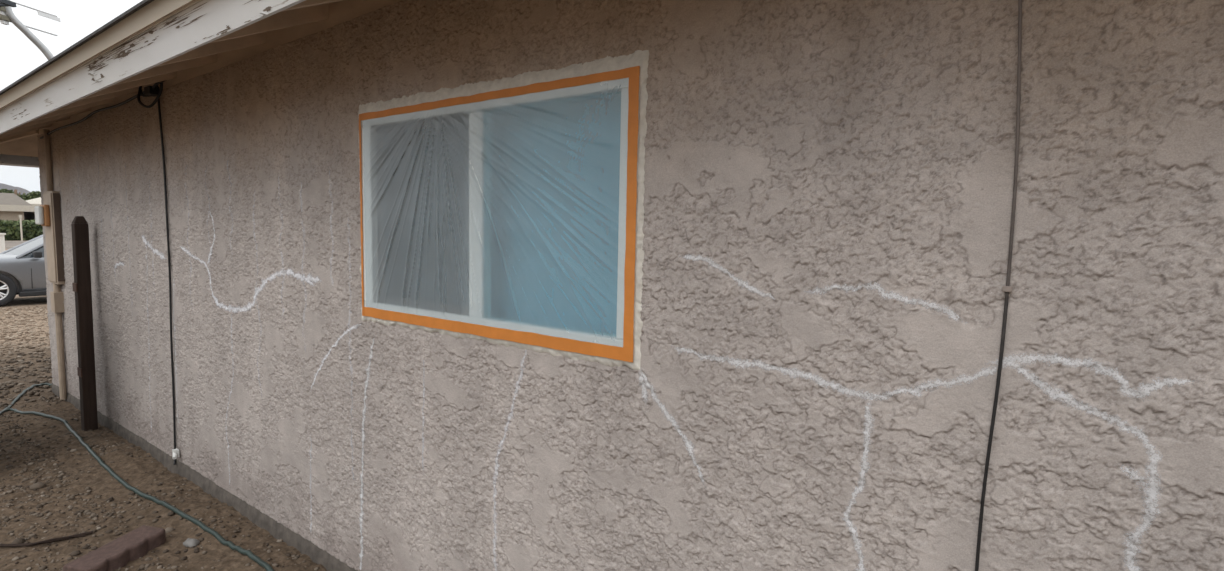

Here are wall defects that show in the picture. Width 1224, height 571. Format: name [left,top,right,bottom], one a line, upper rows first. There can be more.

peeling [86,2,207,83]
crack [115,212,322,483]
crack [311,324,374,570]
crack [493,350,527,571]
crack [638,372,704,481]
crack [683,255,775,300]
crack [805,282,959,320]
crack [677,347,1190,571]